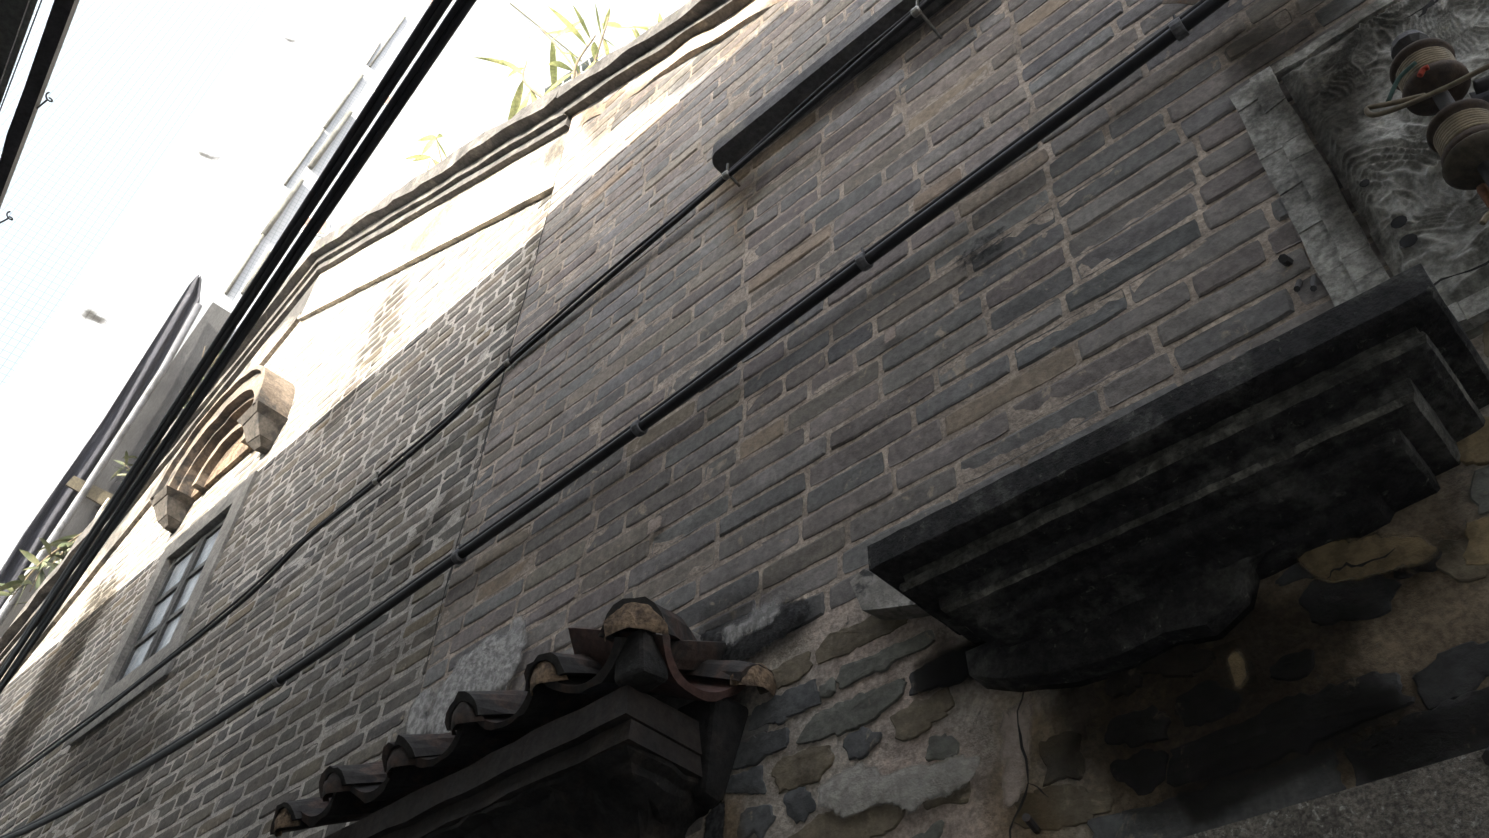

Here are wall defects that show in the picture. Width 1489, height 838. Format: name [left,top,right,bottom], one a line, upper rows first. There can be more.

crack [1404,0,1438,19]
crack [1434,260,1489,286]
leakage [916,640,986,691]
leakage [1063,600,1404,819]